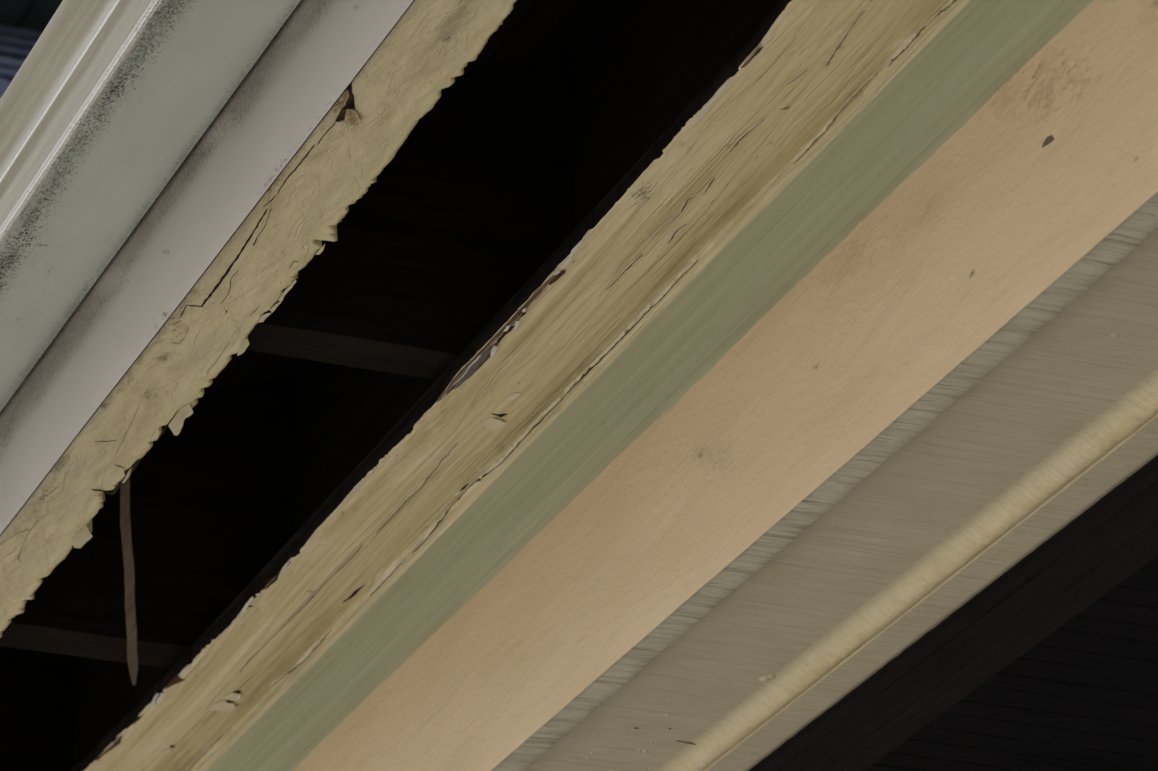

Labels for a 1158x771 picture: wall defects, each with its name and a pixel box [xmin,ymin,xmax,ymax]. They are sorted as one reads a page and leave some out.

leakage [0,0,191,288]
spalling [332,83,361,126]
crack [728,0,872,152]
crack [792,0,957,164]
crack [175,122,336,344]
peeling [258,280,297,323]
crack [91,407,139,494]
peeling [168,403,193,435]
crack [237,178,728,674]
peeling [71,525,93,548]
peeling [223,533,314,633]
peeling [96,666,189,761]